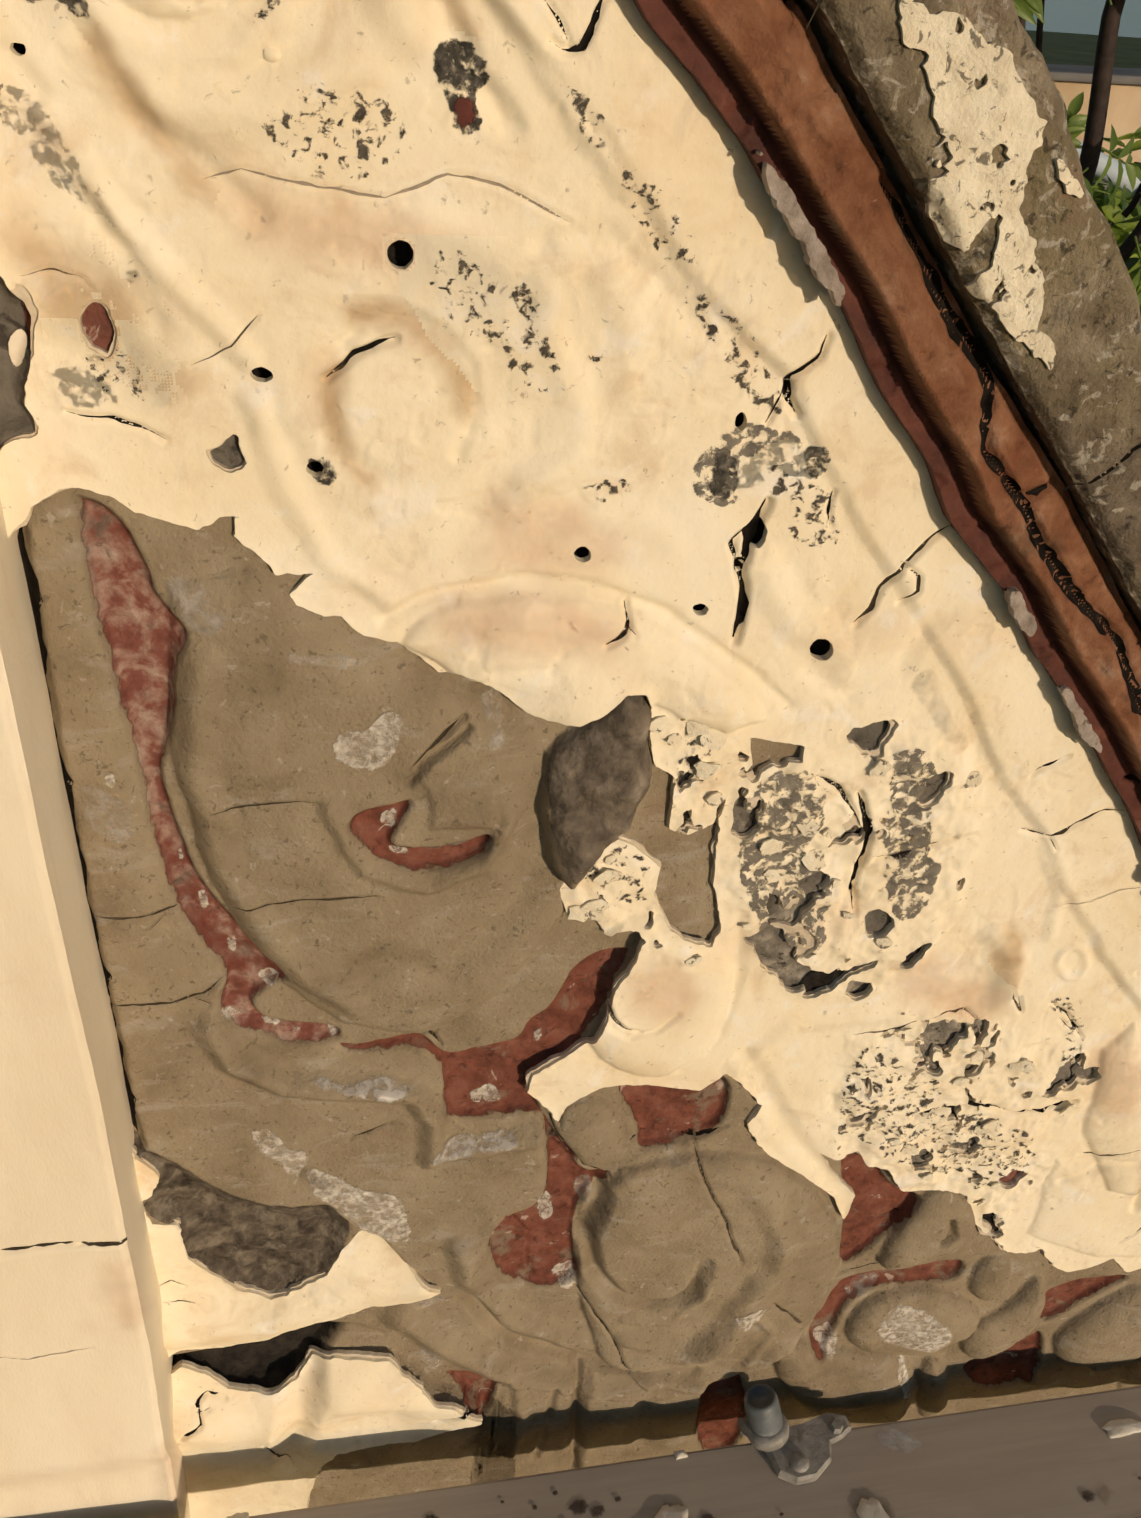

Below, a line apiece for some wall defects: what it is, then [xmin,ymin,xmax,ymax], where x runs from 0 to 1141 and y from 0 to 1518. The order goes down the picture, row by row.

crack [545,0,603,52]
crack [204,168,570,222]
spalling [0,276,35,448]
crack [326,337,394,377]
crack [765,335,827,423]
crack [880,182,1141,716]
crack [728,498,766,637]
crack [854,525,949,622]
crack [606,601,636,645]
crack [817,775,936,909]
spalling [17,488,1141,1508]
crack [1,1237,127,1250]